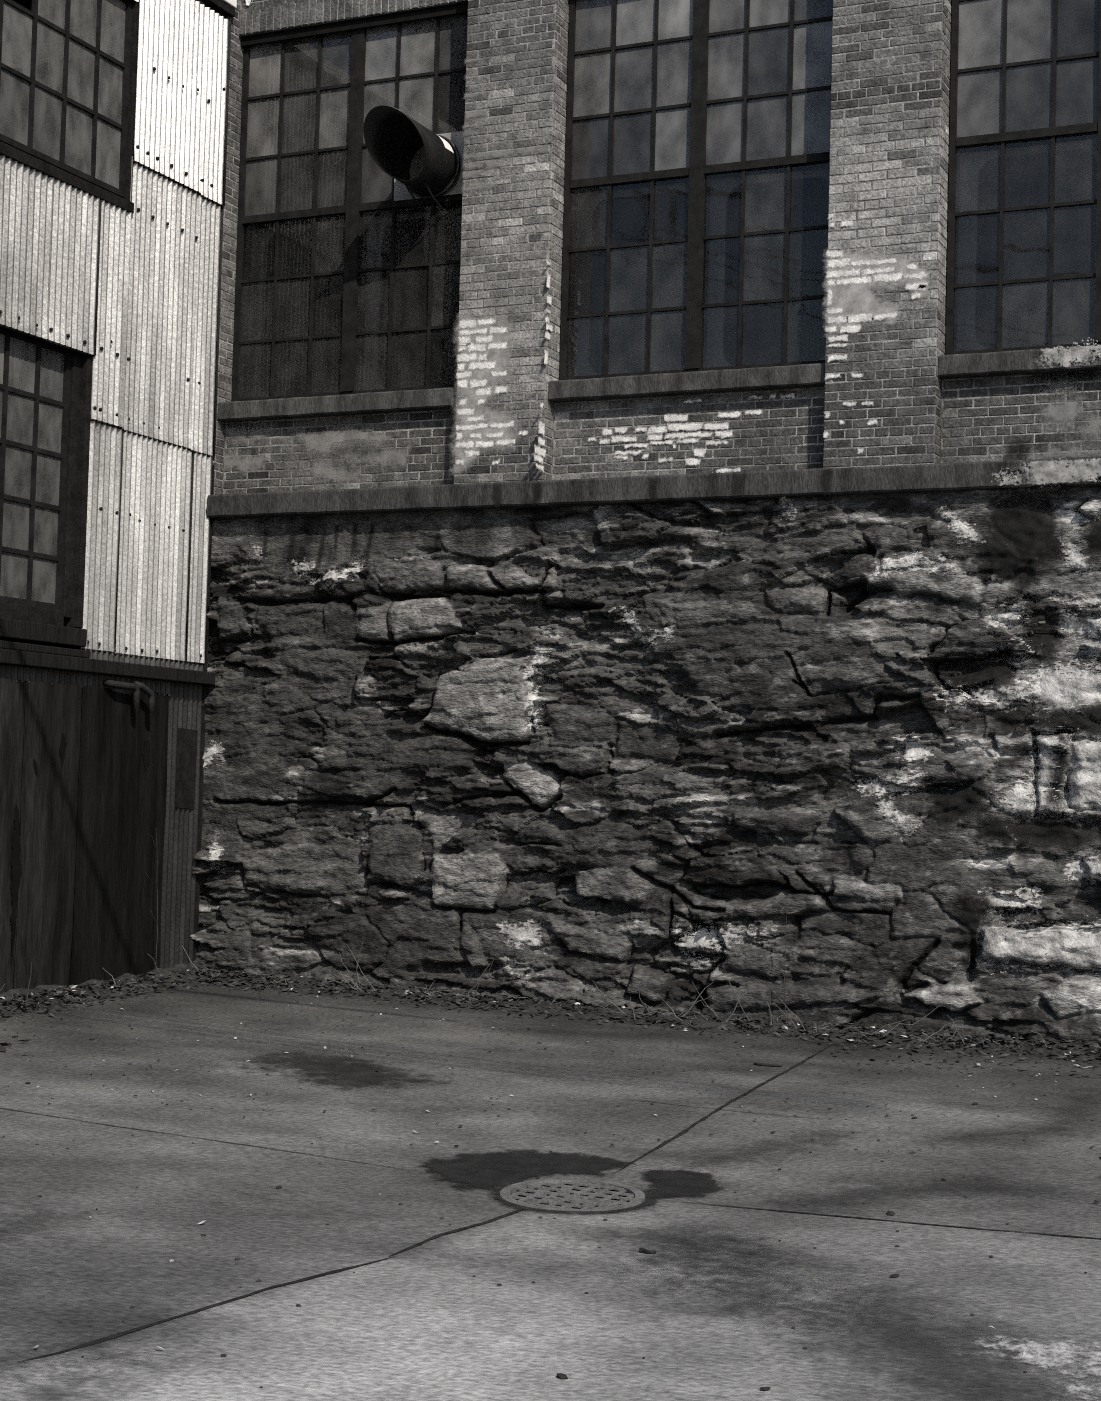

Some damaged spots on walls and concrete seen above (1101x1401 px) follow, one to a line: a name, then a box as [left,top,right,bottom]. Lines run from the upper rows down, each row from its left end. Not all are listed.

peeling [544,260,553,364]
peeling [825,250,930,380]
peeling [452,317,546,472]
peeling [588,393,795,465]
peeling [823,401,877,438]